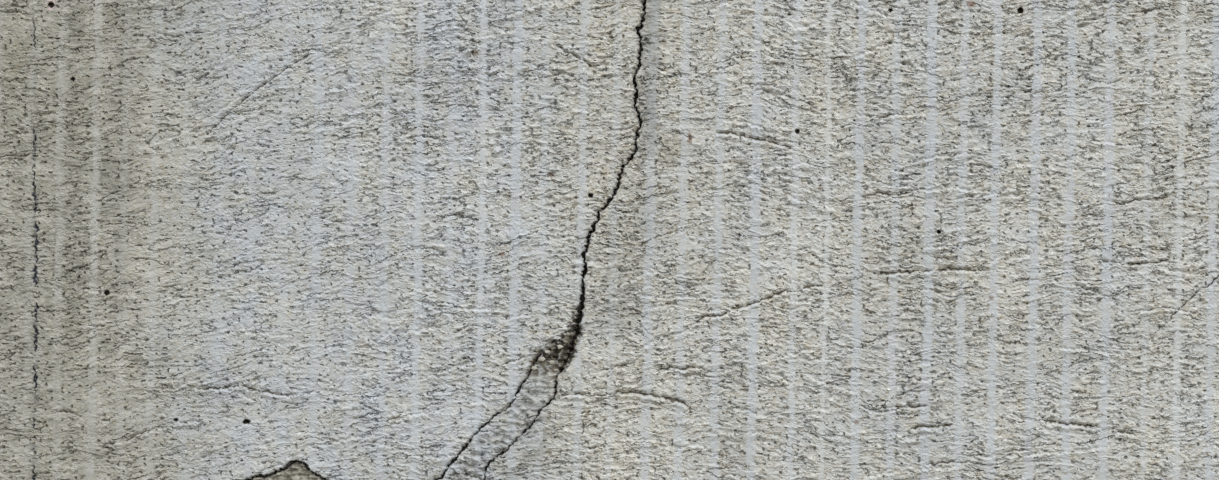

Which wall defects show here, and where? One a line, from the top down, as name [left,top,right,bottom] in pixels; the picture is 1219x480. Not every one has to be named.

spalling [246,460,329,480]
crack [435,0,709,480]